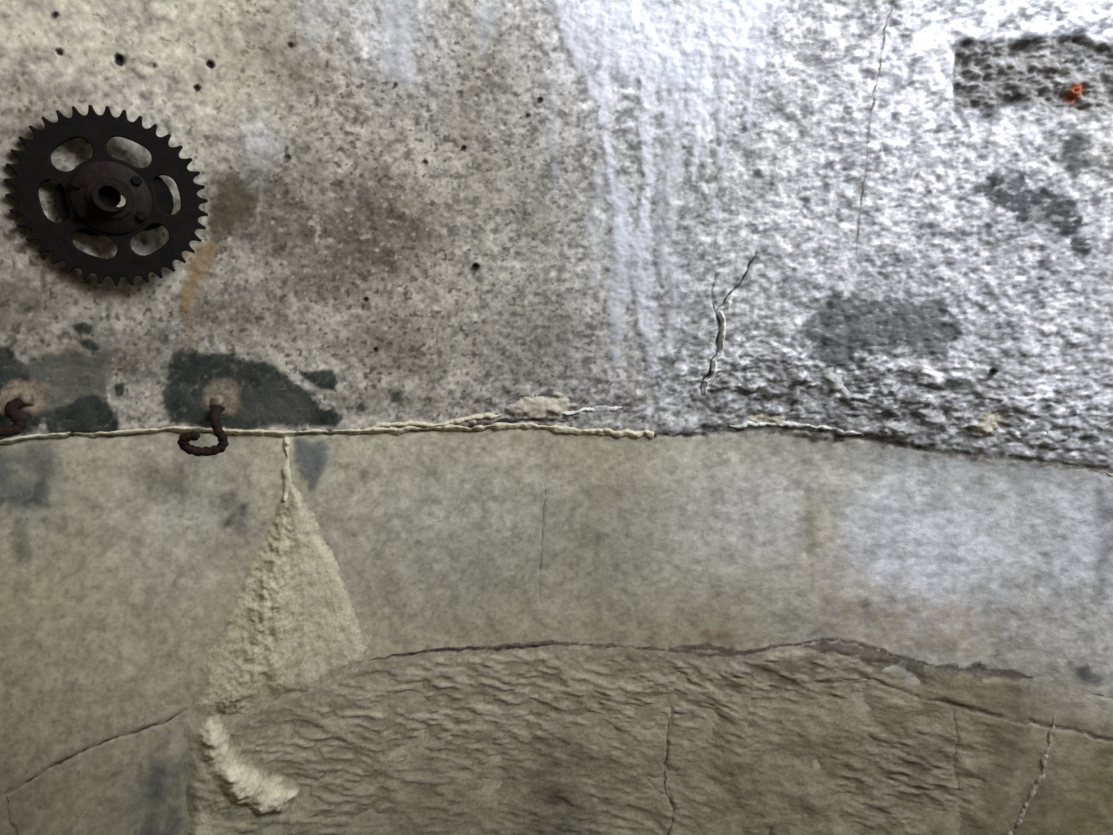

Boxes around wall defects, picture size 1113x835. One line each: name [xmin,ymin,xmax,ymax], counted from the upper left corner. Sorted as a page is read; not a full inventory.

spalling [952,31,1113,118]
damp [550,0,775,371]
crack [700,255,756,394]
corrosion [0,380,48,413]
crack [0,406,1113,476]
crack [7,714,178,804]
crack [371,638,1110,835]